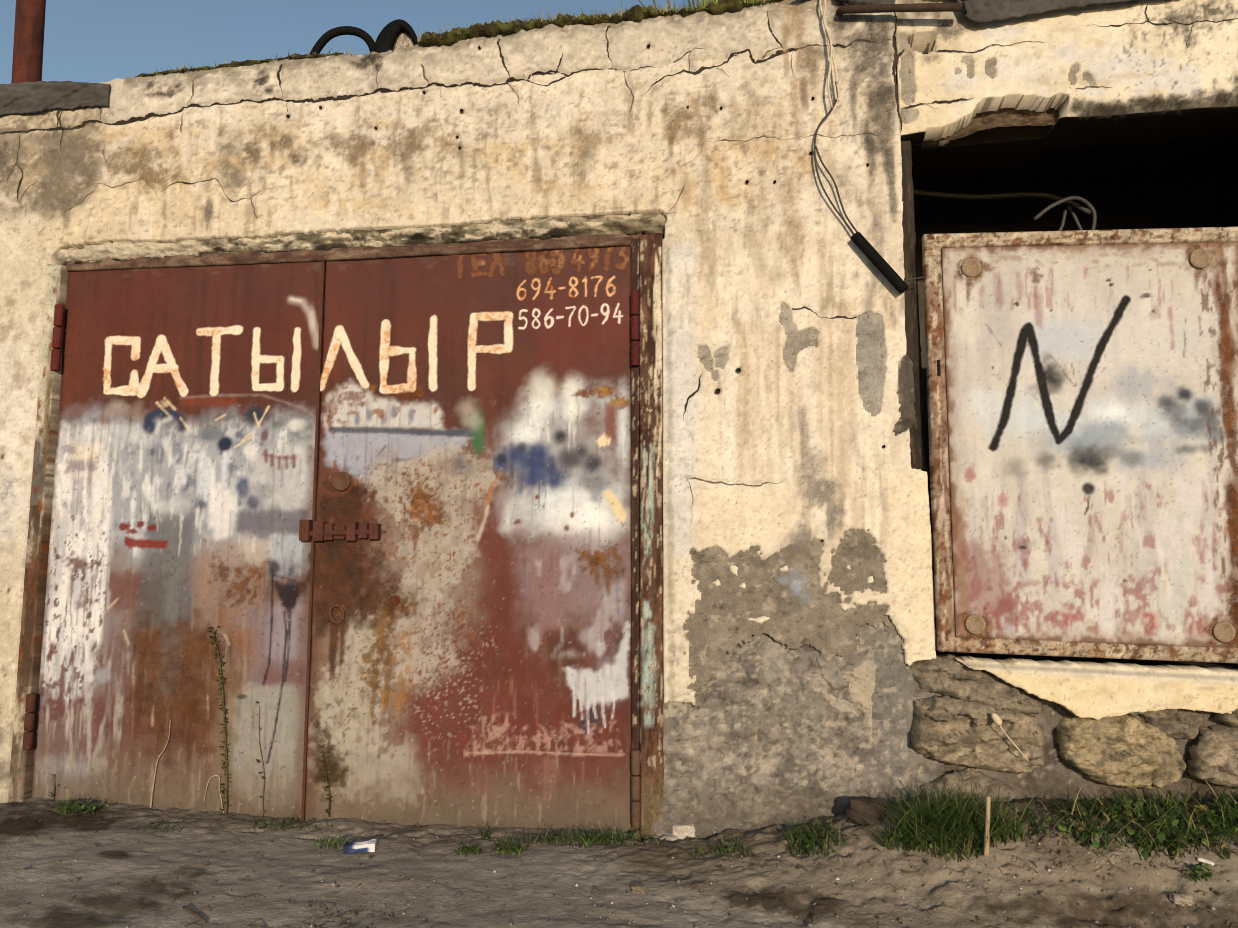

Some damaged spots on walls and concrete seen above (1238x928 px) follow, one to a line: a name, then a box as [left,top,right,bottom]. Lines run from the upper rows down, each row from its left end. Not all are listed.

crack [936,41,1048,53]
crack [1087,3,1238,50]
crack [0,11,973,219]
water stain [1072,97,1188,117]
water stain [108,149,167,185]
water stain [223,135,297,188]
flaking render [779,303,818,372]
flaking render [856,311,915,436]
corrosion [1216,281,1238,557]
corrosion [293,487,413,717]
corrosion [1205,574,1238,646]
flaking render [649,528,945,839]